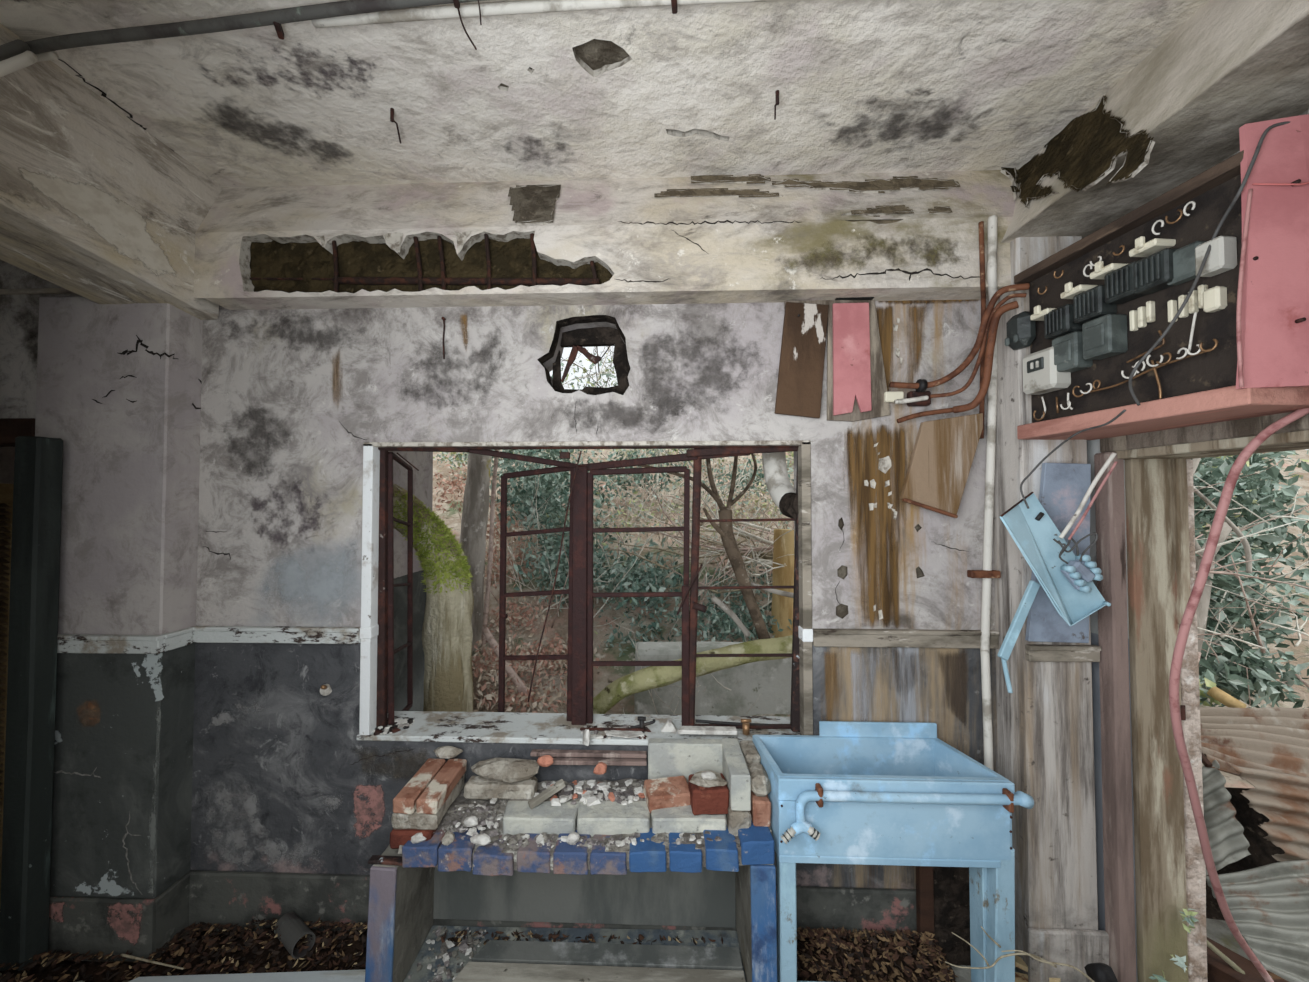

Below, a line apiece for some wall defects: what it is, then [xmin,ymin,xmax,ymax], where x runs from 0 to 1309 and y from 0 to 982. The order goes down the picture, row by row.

flaking render [572,39,632,77]
crack [58,59,174,151]
flaking render [1000,94,1155,208]
spalling [239,185,615,294]
crack [616,276,669,284]
crack [820,268,980,281]
crack [92,335,202,409]
water stain [231,318,344,396]
hole [537,315,631,395]
water stain [567,333,754,431]
mould [228,409,288,476]
water stain [252,481,321,545]